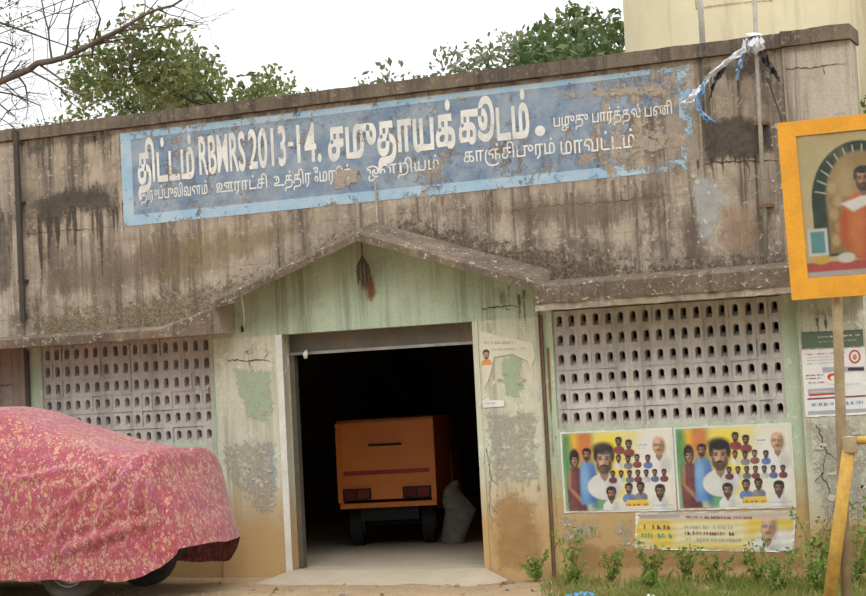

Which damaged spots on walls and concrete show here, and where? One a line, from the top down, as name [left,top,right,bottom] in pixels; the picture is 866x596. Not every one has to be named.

peeling [556,82,671,102]
peeling [589,125,673,163]
leakage [697,116,773,186]
leakage [37,182,180,295]
peeling [233,368,274,422]
peeling [498,355,526,400]
peeling [223,439,282,518]
peeling [485,410,540,488]
crack [815,425,862,519]